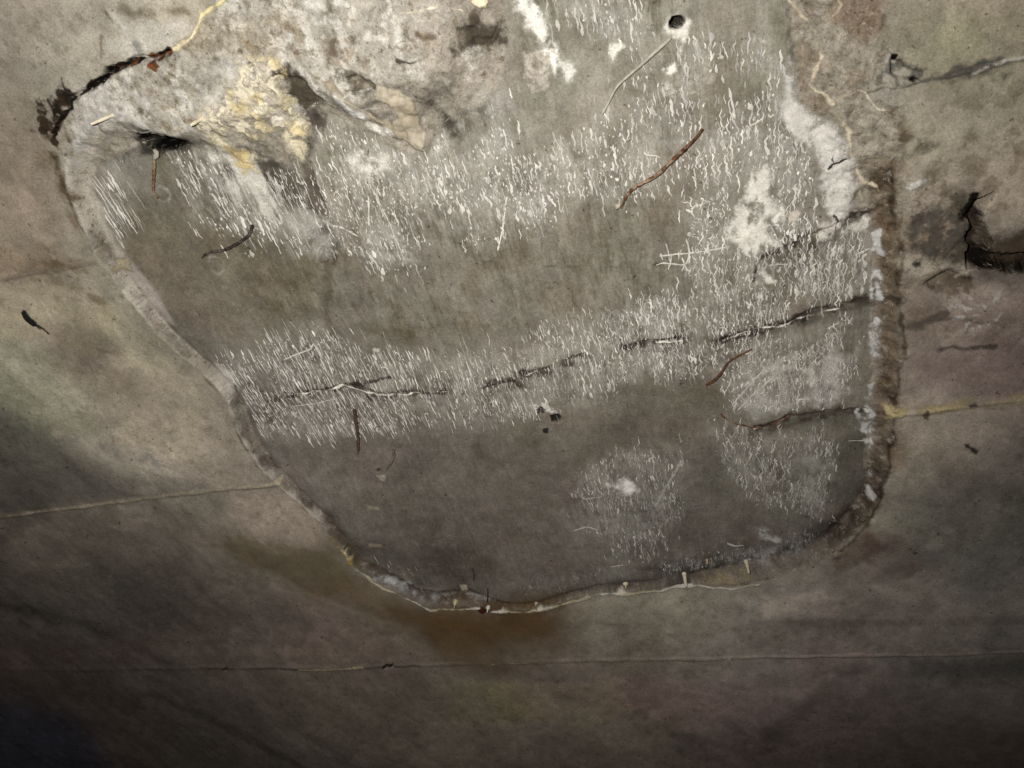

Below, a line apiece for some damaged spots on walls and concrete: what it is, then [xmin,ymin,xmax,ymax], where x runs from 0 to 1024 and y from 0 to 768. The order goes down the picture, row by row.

water stain [72,87,162,162]
water stain [87,154,144,249]
crack [268,376,447,402]
water stain [166,0,887,614]
crack [483,353,586,389]
spalling [64,0,1024,610]
crack [619,333,686,350]
crack [717,289,877,343]